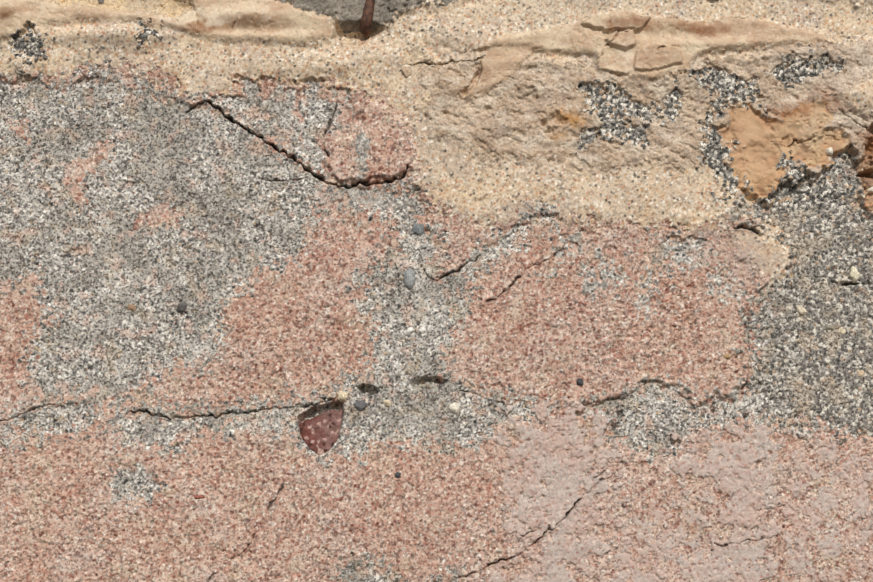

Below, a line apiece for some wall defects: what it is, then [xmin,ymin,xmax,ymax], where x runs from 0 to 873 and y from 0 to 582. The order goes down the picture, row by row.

spalling [8,20,49,66]
spalling [134,18,164,50]
crack [189,94,410,190]
spalling [0,56,559,469]
crack [423,251,487,281]
crack [478,225,592,311]
spalling [477,11,873,582]
crack [561,285,766,411]
crack [115,384,346,424]
spalling [109,460,172,508]
crack [207,465,302,582]
spalling [330,552,409,582]